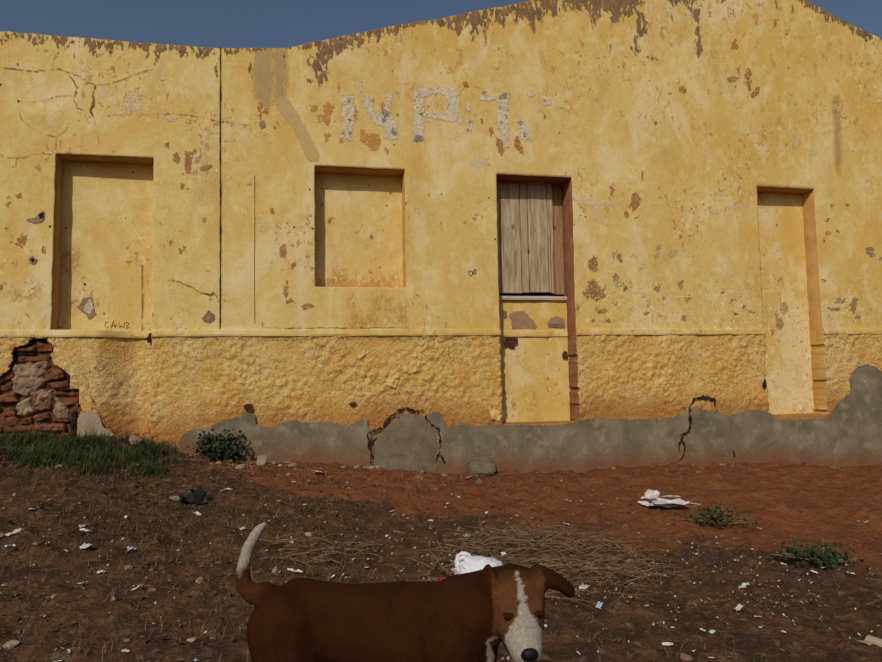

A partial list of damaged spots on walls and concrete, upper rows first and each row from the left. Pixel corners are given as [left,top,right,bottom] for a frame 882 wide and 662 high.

peeling [289,0,658,92]
crack [4,52,152,138]
peeling [727,66,760,98]
spalling [27,211,45,223]
crack [167,47,462,338]
spalling [76,297,96,320]
spalling [503,311,566,348]
peeling [576,256,611,323]
flaking render [0,339,113,440]
crack [367,407,446,464]
peeling [426,364,882,474]
crack [677,395,718,463]